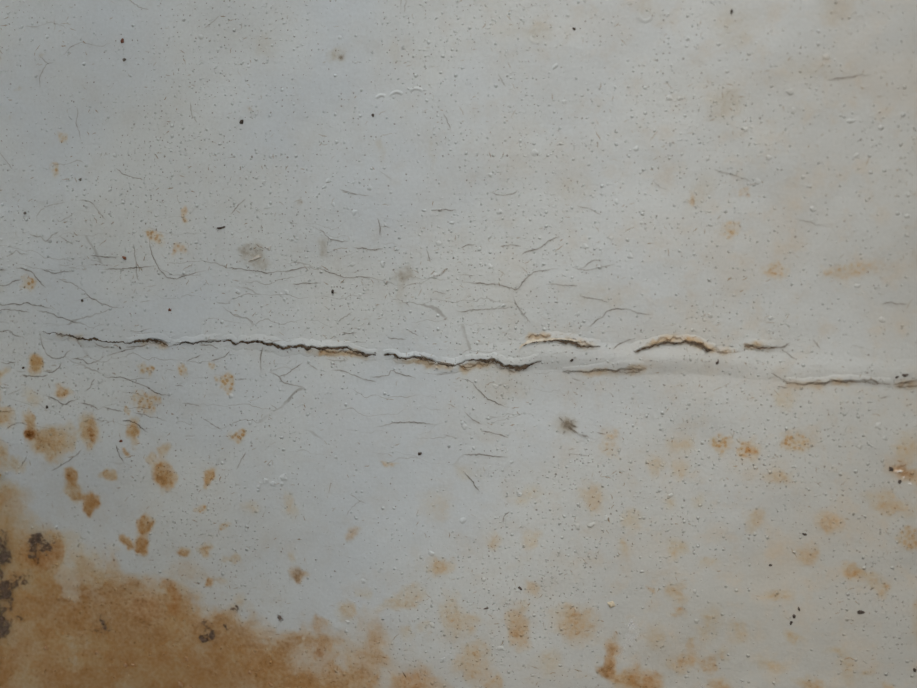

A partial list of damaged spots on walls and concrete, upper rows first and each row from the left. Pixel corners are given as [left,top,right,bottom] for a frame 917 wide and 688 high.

crack [43,317,716,375]
crack [744,337,778,350]
crack [786,374,911,387]
water stain [0,529,28,639]